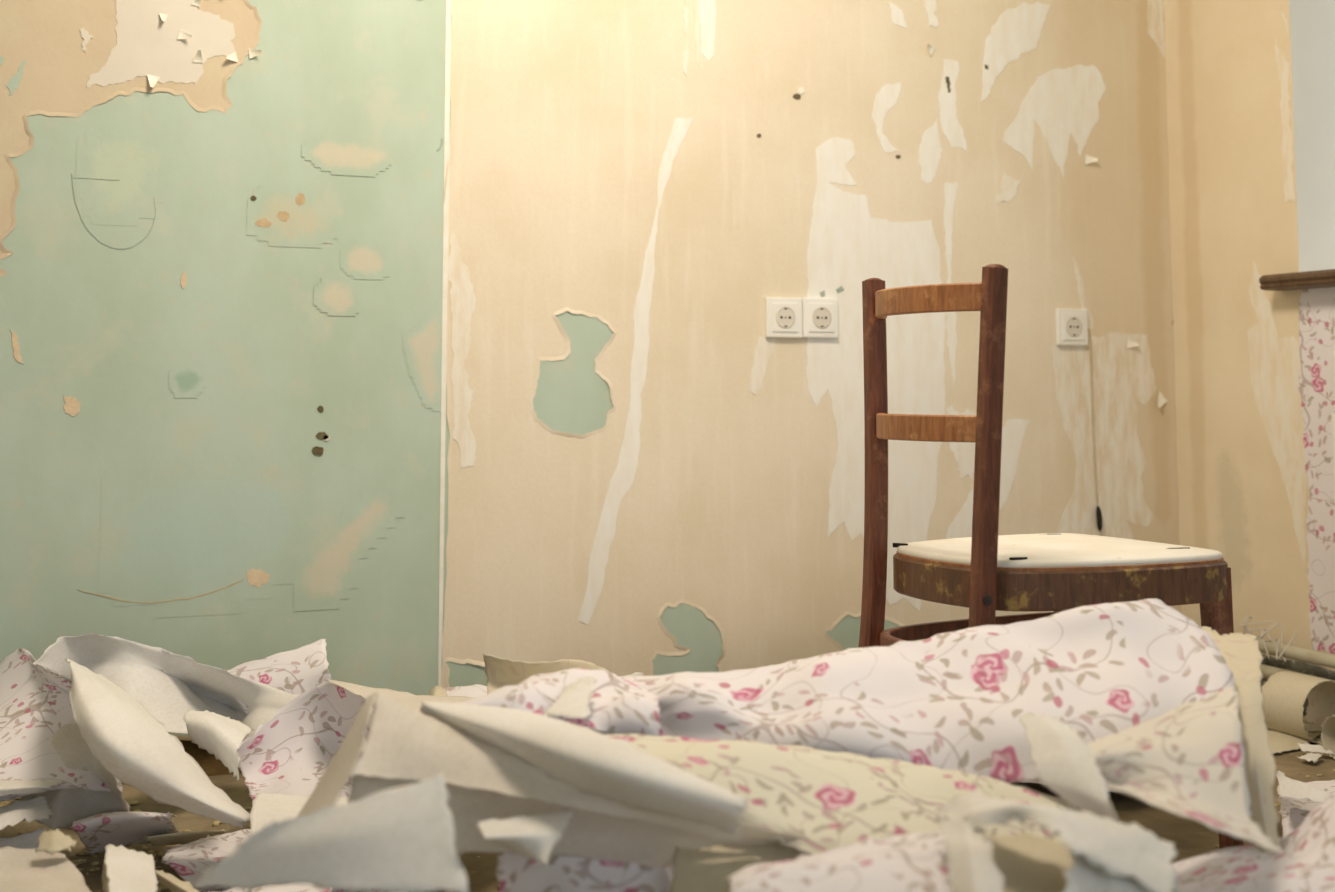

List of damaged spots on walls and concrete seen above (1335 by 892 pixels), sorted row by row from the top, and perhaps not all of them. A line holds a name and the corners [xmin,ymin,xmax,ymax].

peeling [0,0,488,695]
peeling [529,308,617,439]
peeling [649,599,726,676]
peeling [823,611,861,651]
peeling [884,616,905,630]
peeling [168,732,192,741]